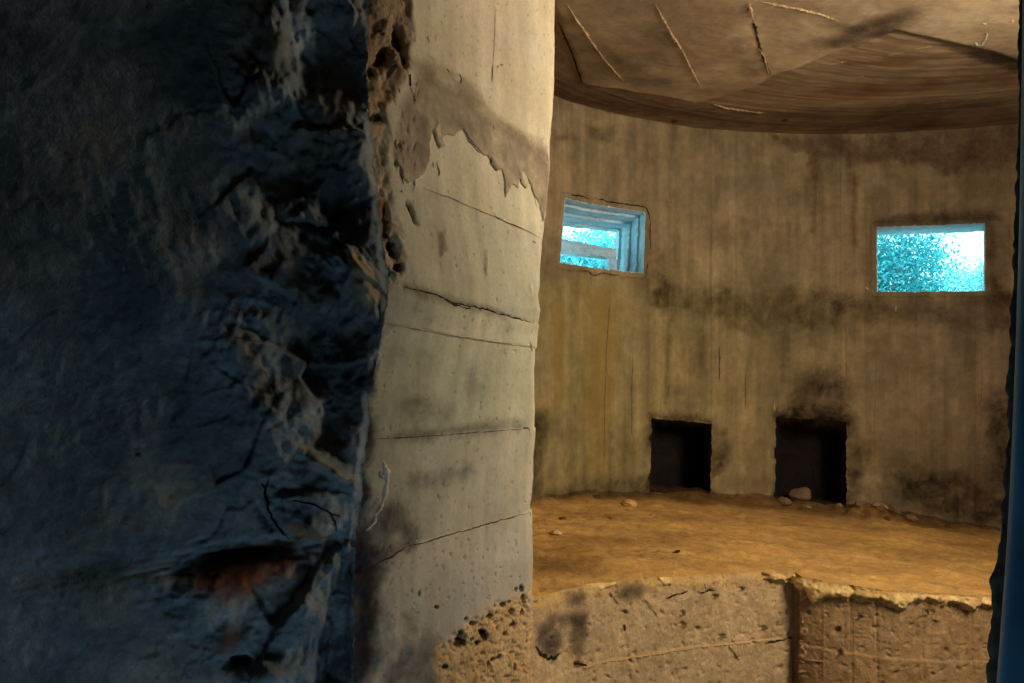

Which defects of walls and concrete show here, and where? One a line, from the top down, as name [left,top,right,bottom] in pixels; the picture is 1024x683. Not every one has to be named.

crack [752,20,771,76]
flaking render [397,77,549,221]
crack [406,287,529,322]
leakage [886,408,1008,526]
crack [261,478,341,540]
spalling [453,586,527,647]
leakage [539,613,588,655]